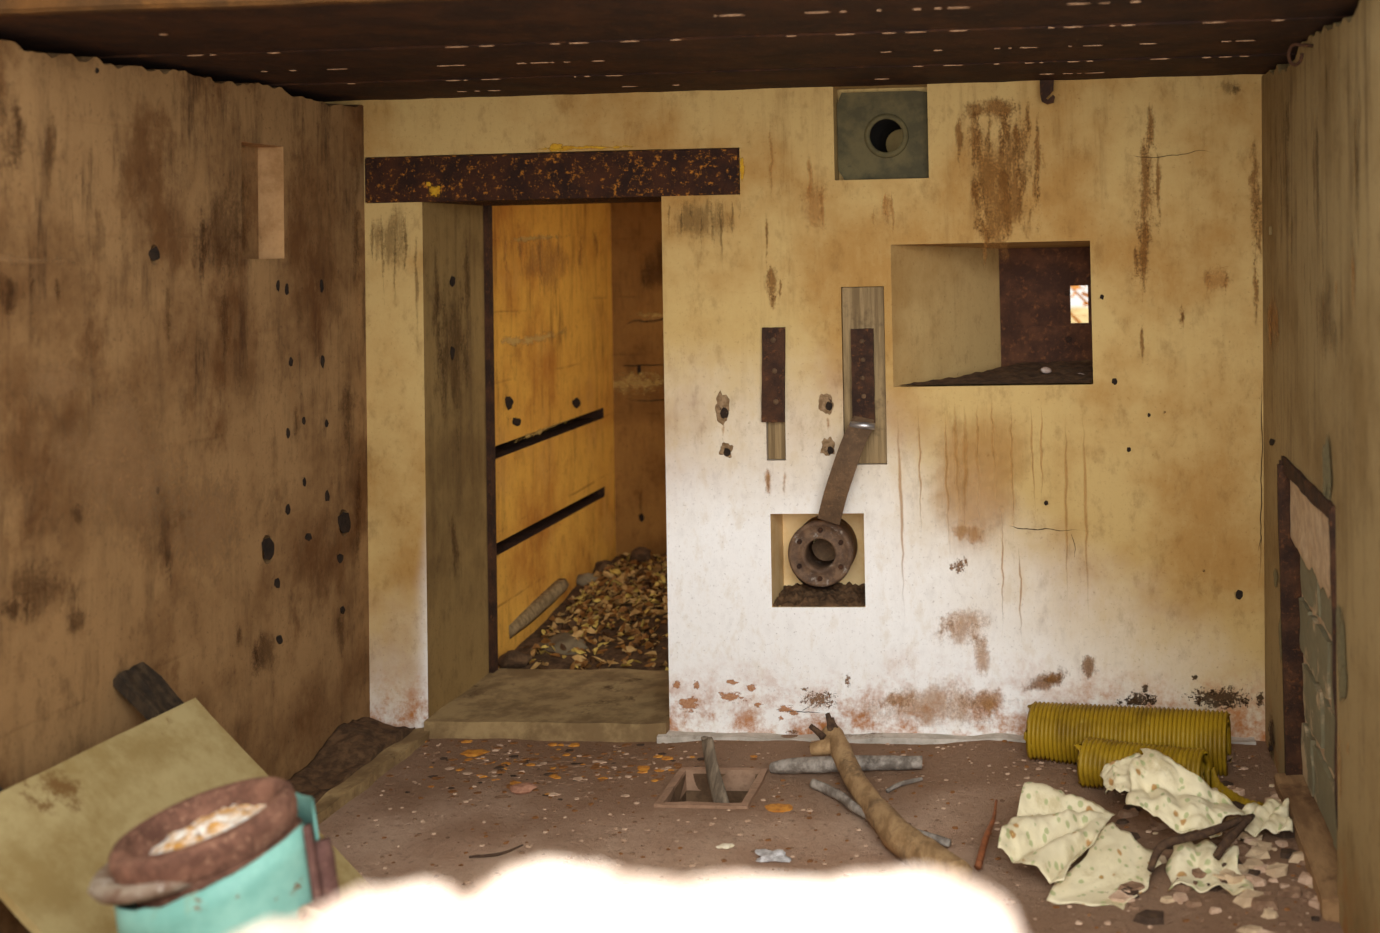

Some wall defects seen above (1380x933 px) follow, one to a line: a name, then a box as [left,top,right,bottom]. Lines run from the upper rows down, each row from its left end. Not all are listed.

corrosion [956,99,1040,259]
corrosion [1134,108,1161,279]
peeling [673,681,699,713]
peeling [718,675,851,734]
mould [1115,683,1157,706]
mould [1188,675,1275,761]